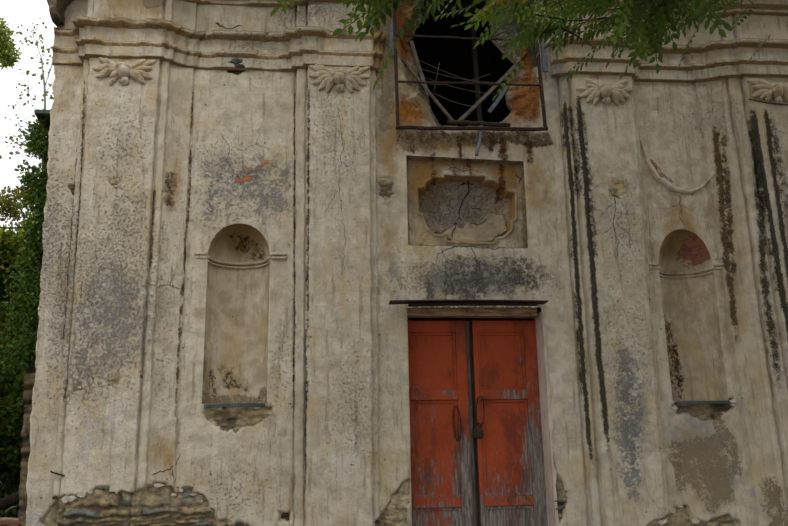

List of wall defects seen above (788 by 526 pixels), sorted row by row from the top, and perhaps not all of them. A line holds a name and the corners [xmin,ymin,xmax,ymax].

peeling [374,2,553,151]
crack [427,157,537,295]
leakage [426,255,551,300]
leakage [561,96,610,460]
leakage [712,127,739,338]
leakage [748,108,788,385]
spalling [41,483,244,526]
spalling [375,480,410,526]
peeling [648,398,743,526]
peeling [759,477,788,526]